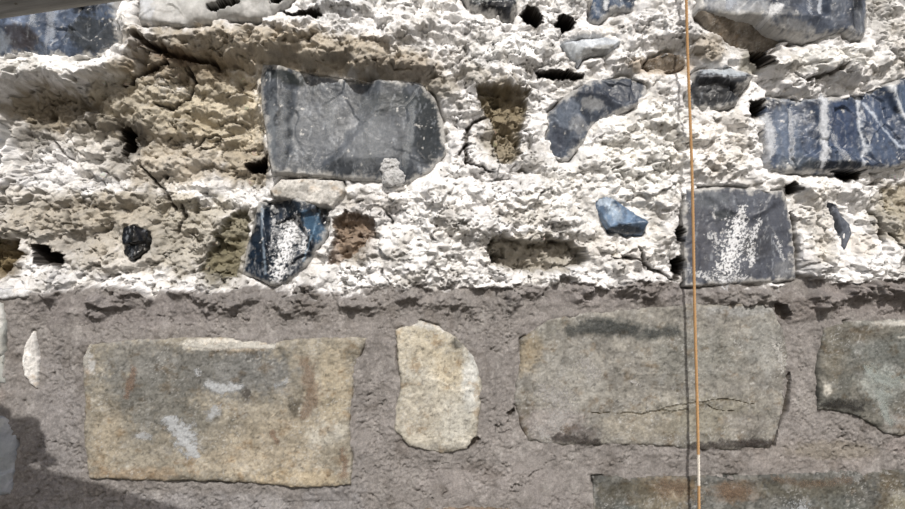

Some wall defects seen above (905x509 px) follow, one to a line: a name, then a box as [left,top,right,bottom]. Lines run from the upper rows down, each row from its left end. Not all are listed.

crack [117,0,222,111]
crack [591,398,755,415]